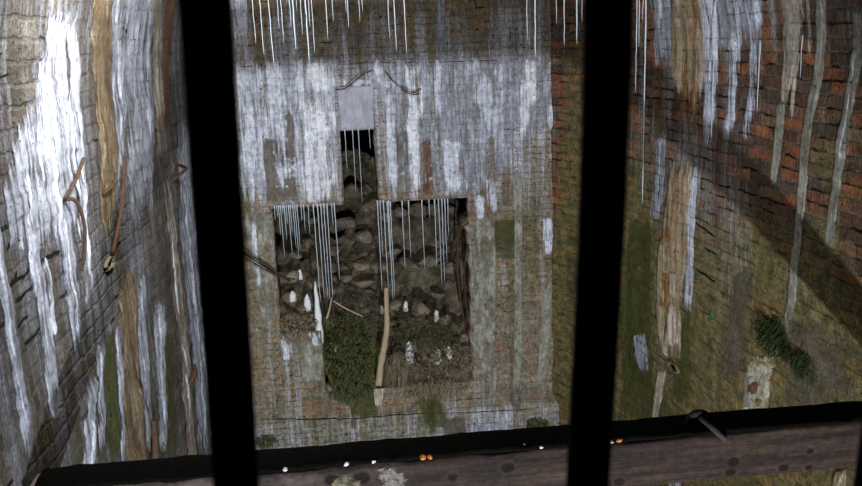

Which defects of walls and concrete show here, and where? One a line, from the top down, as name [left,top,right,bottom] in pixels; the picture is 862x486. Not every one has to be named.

damp [0,228,32,447]
damp [28,222,59,418]
damp [37,13,93,351]
damp [98,0,128,225]
damp [83,117,209,464]
damp [263,66,337,202]
damp [396,65,423,197]
peeling [656,272,681,347]
damp [684,166,700,310]
damp [683,0,741,145]
damp [770,0,827,327]
damp [825,7,862,246]